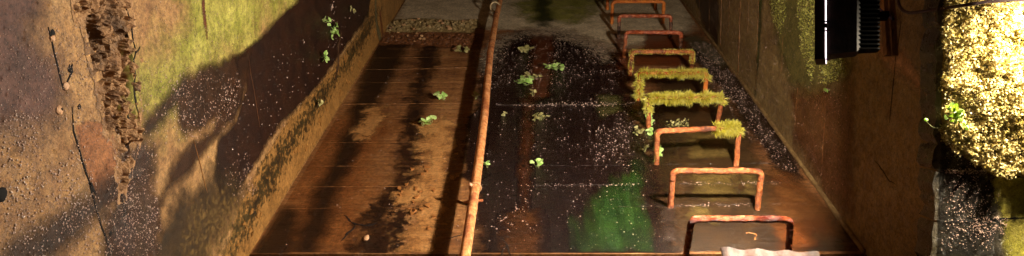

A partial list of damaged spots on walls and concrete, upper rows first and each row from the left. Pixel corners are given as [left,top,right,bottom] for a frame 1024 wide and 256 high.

crack [48,27,126,255]
spalling [71,0,145,205]
rust [613,34,690,70]
damp [461,0,851,253]